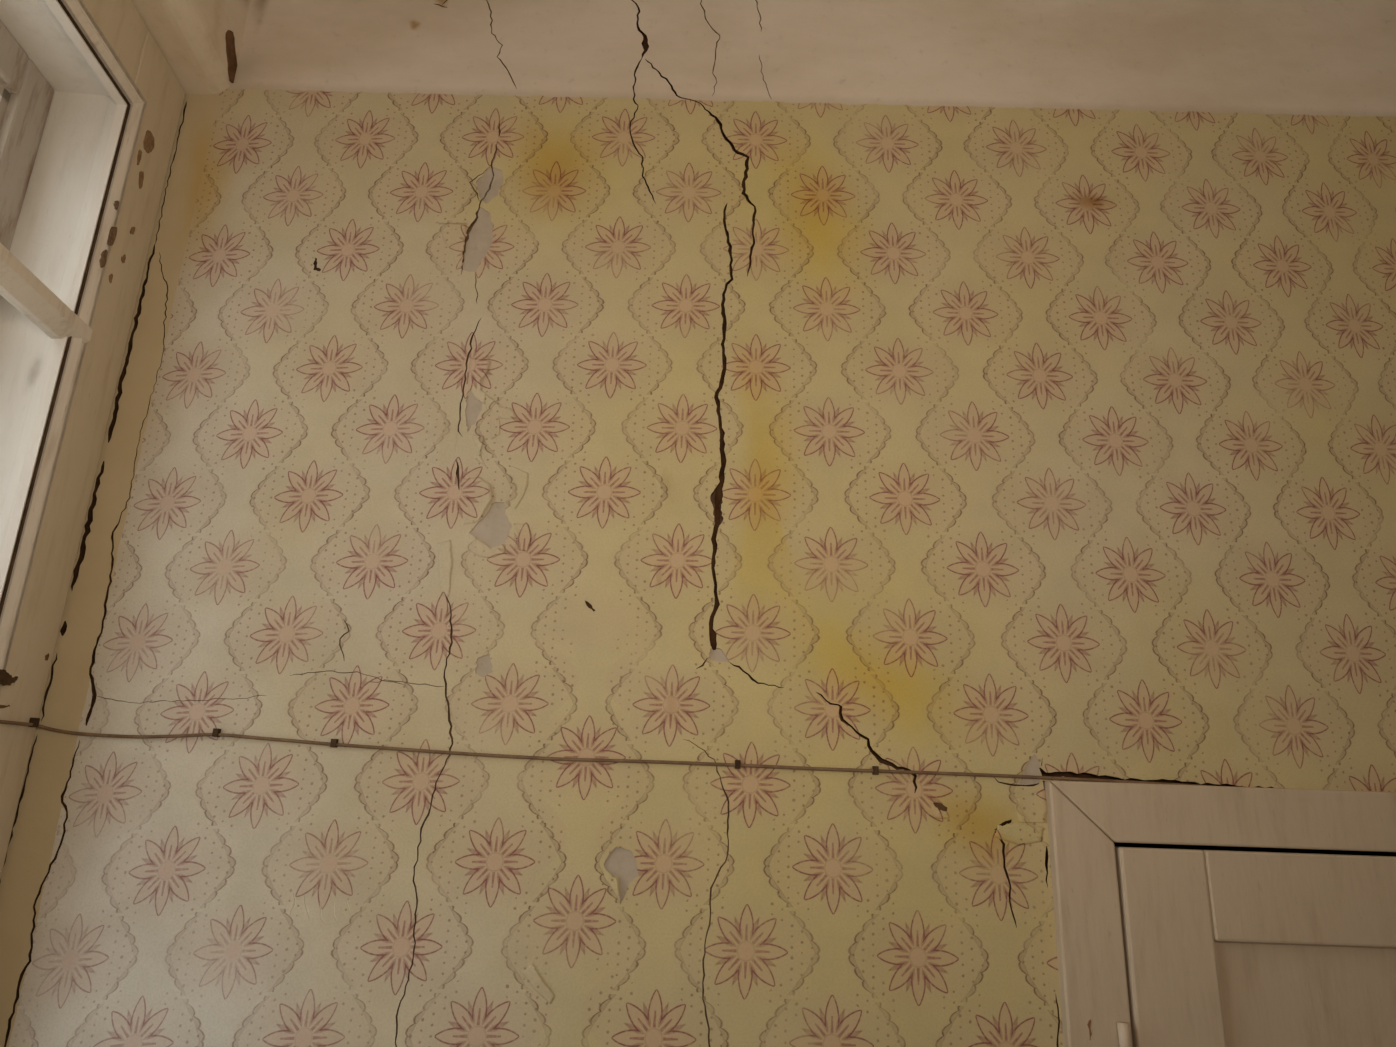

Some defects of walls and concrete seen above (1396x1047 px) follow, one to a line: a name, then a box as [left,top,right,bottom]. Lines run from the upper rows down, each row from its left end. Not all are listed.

crack [486,0,517,89]
crack [456,123,501,488]
crack [629,0,917,792]
crack [0,101,453,1047]
crack [684,739,730,1047]
crack [995,832,1017,928]
crack [1042,846,1050,887]
crack [1054,998,1062,1047]